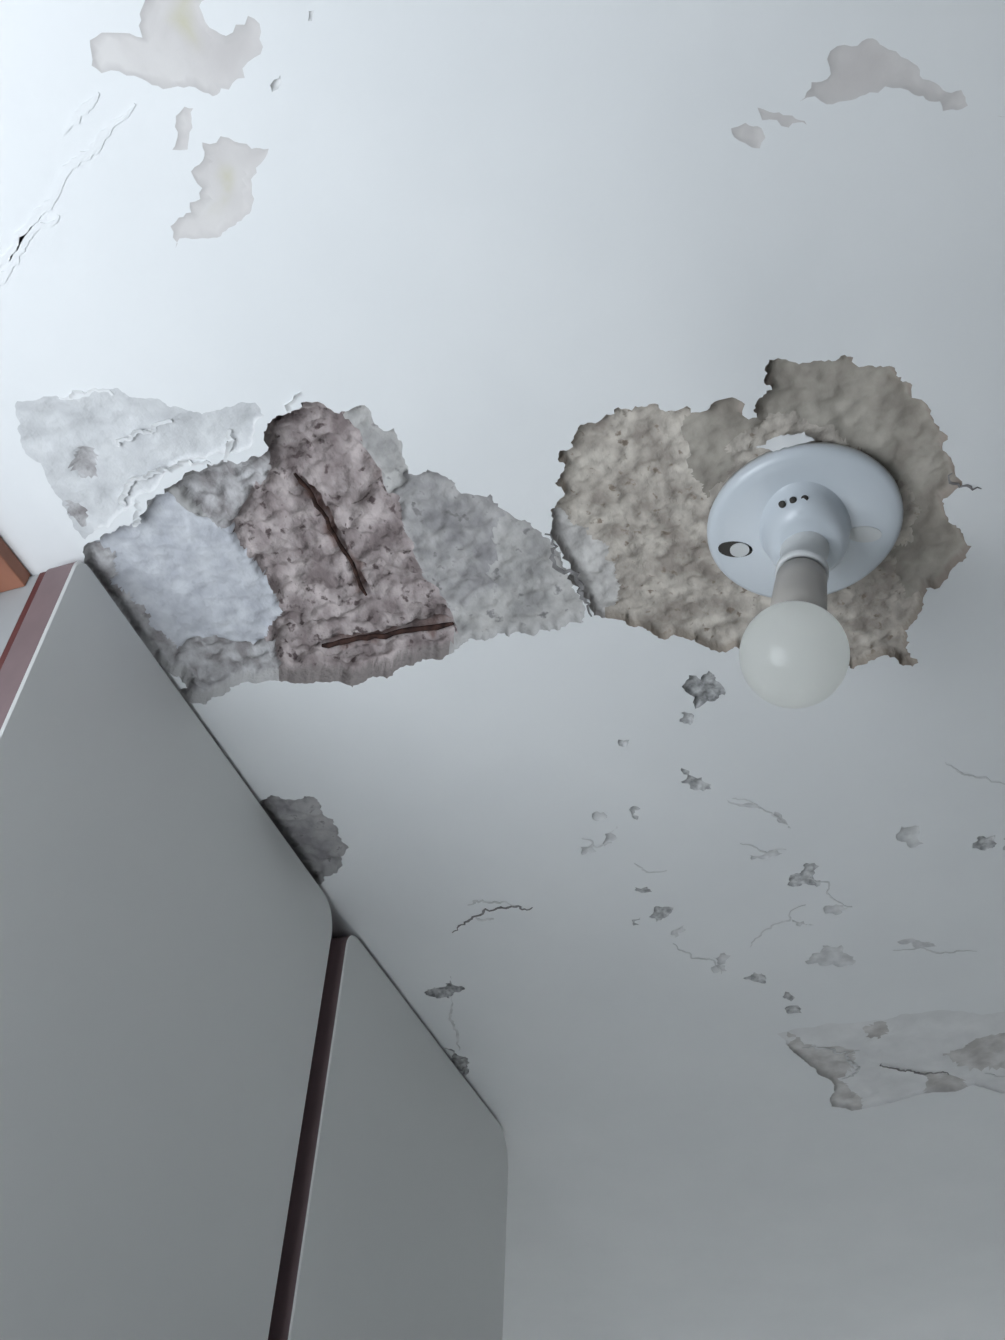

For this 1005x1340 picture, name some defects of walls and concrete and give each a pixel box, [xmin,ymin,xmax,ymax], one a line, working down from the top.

peeling [90,0,263,96]
peeling [801,38,968,111]
peeling [731,108,807,148]
peeling [171,107,268,246]
spalling [15,355,982,704]
flaking render [679,671,726,725]
peeling [681,768,711,791]
flaking render [259,795,349,885]
crack [452,900,533,933]
peeling [632,863,730,974]
peeling [788,863,851,915]
peeling [778,991,1005,1111]